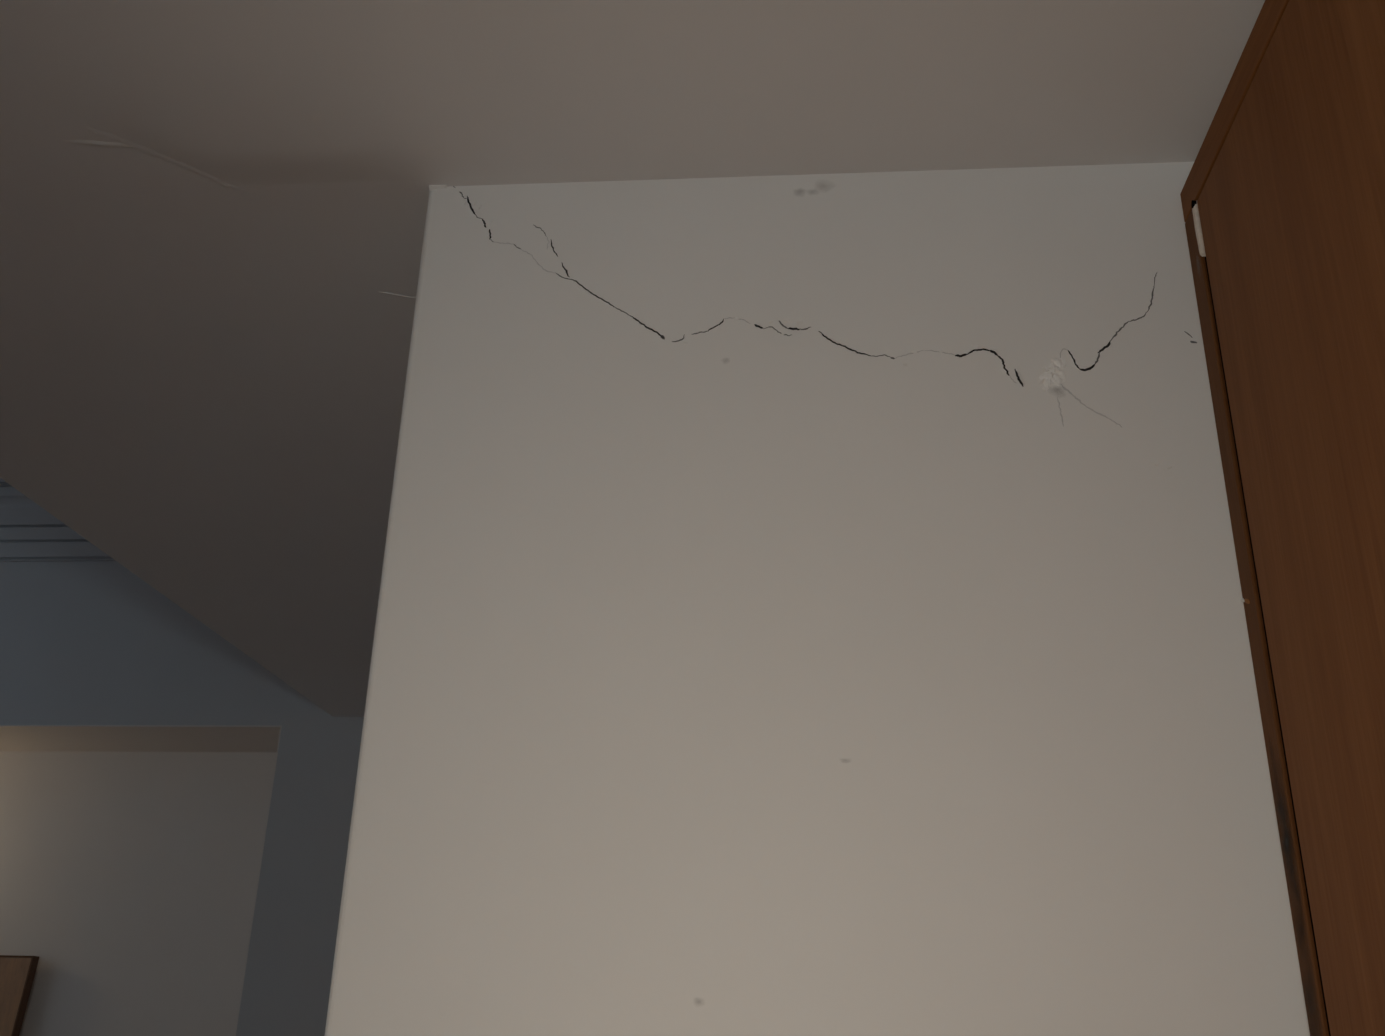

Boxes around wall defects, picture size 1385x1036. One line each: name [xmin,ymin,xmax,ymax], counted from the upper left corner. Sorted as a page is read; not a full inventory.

crack [453,186,1025,387]
crack [1067,273,1157,371]